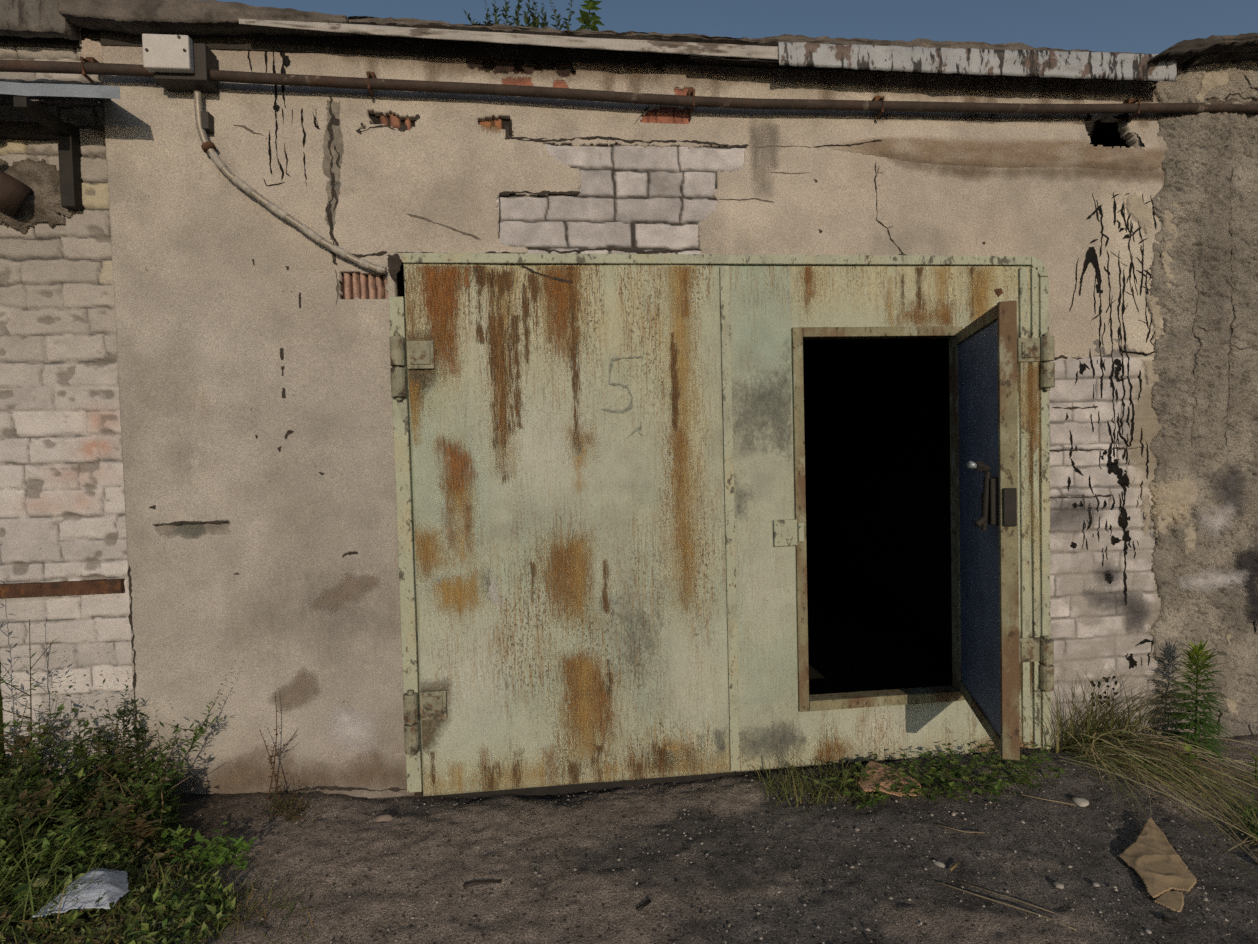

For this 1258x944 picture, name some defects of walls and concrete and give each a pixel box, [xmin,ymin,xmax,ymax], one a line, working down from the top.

flaking render [356,113,420,134]
crack [322,96,527,265]
flaking render [479,119,749,254]
crack [874,162,906,255]
spalling [1083,113,1131,149]
rust [408,265,590,483]
rust [668,267,689,593]
flaking render [153,520,230,539]
rust [438,440,474,558]
rust [529,540,609,615]
flaking render [1049,339,1199,748]
rust [562,655,614,784]